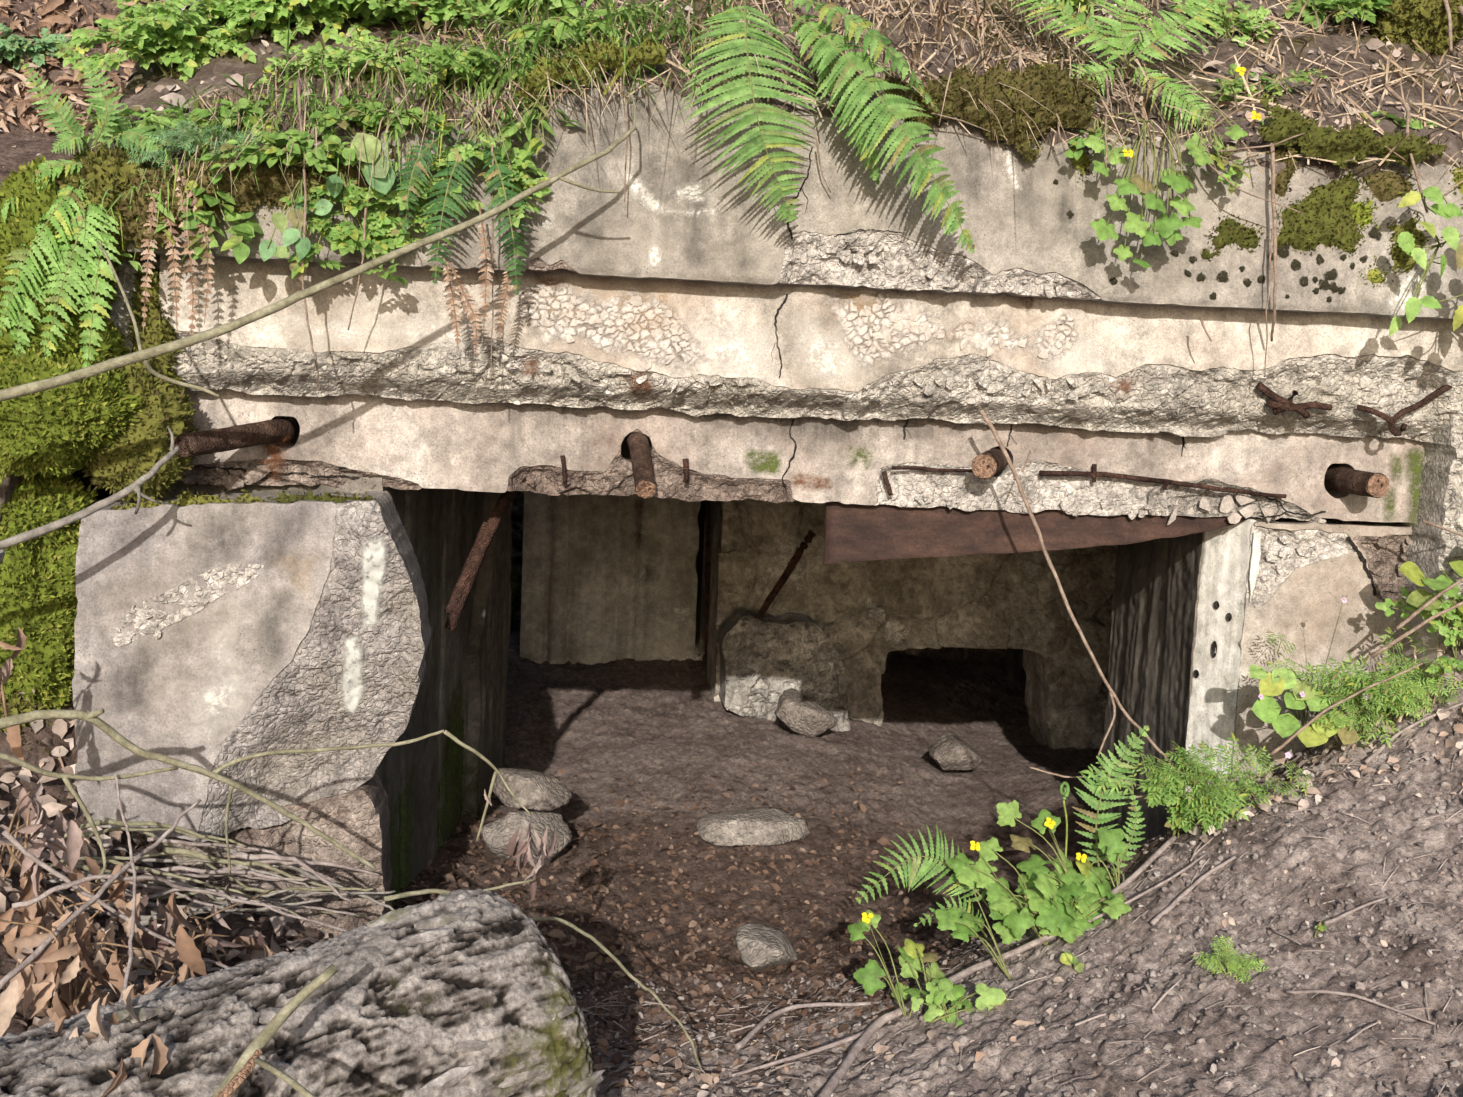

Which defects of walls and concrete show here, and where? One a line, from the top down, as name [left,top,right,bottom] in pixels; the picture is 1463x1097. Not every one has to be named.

spalling [776,229,1101,300]
water stain [800,327,852,376]
rust [1256,381,1332,419]
rust [1356,385,1452,436]
spalling [169,329,1463,612]
rust [1039,464,1287,498]
spalling [183,459,431,842]